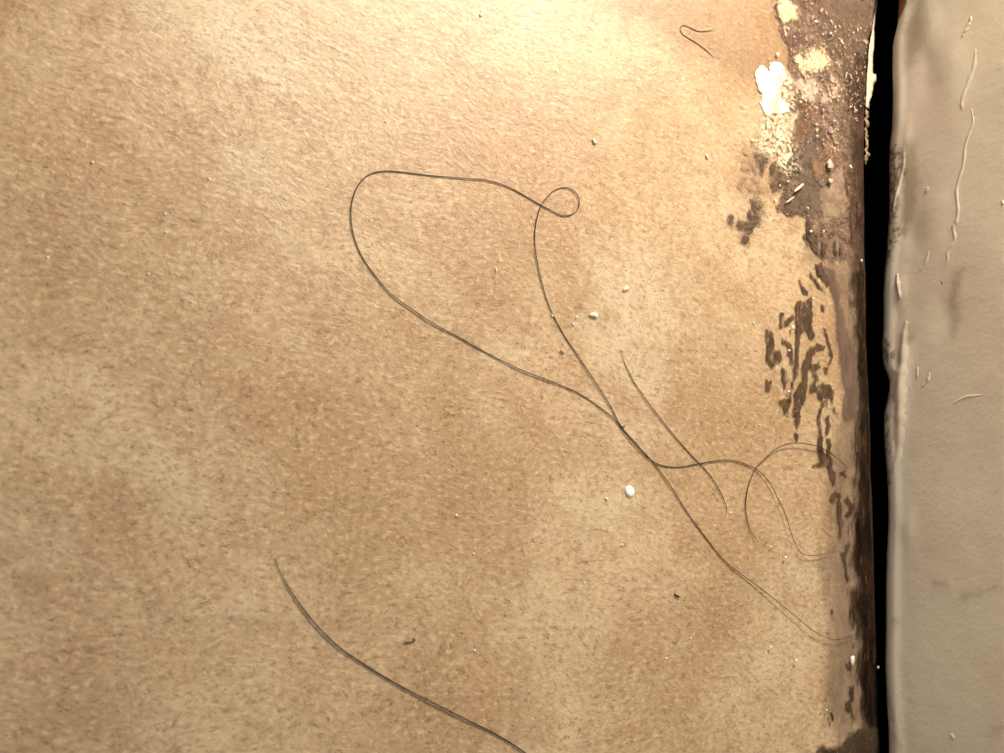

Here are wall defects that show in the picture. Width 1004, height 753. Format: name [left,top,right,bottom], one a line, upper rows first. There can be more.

leakage [728,0,880,753]
peeling [864,2,877,165]